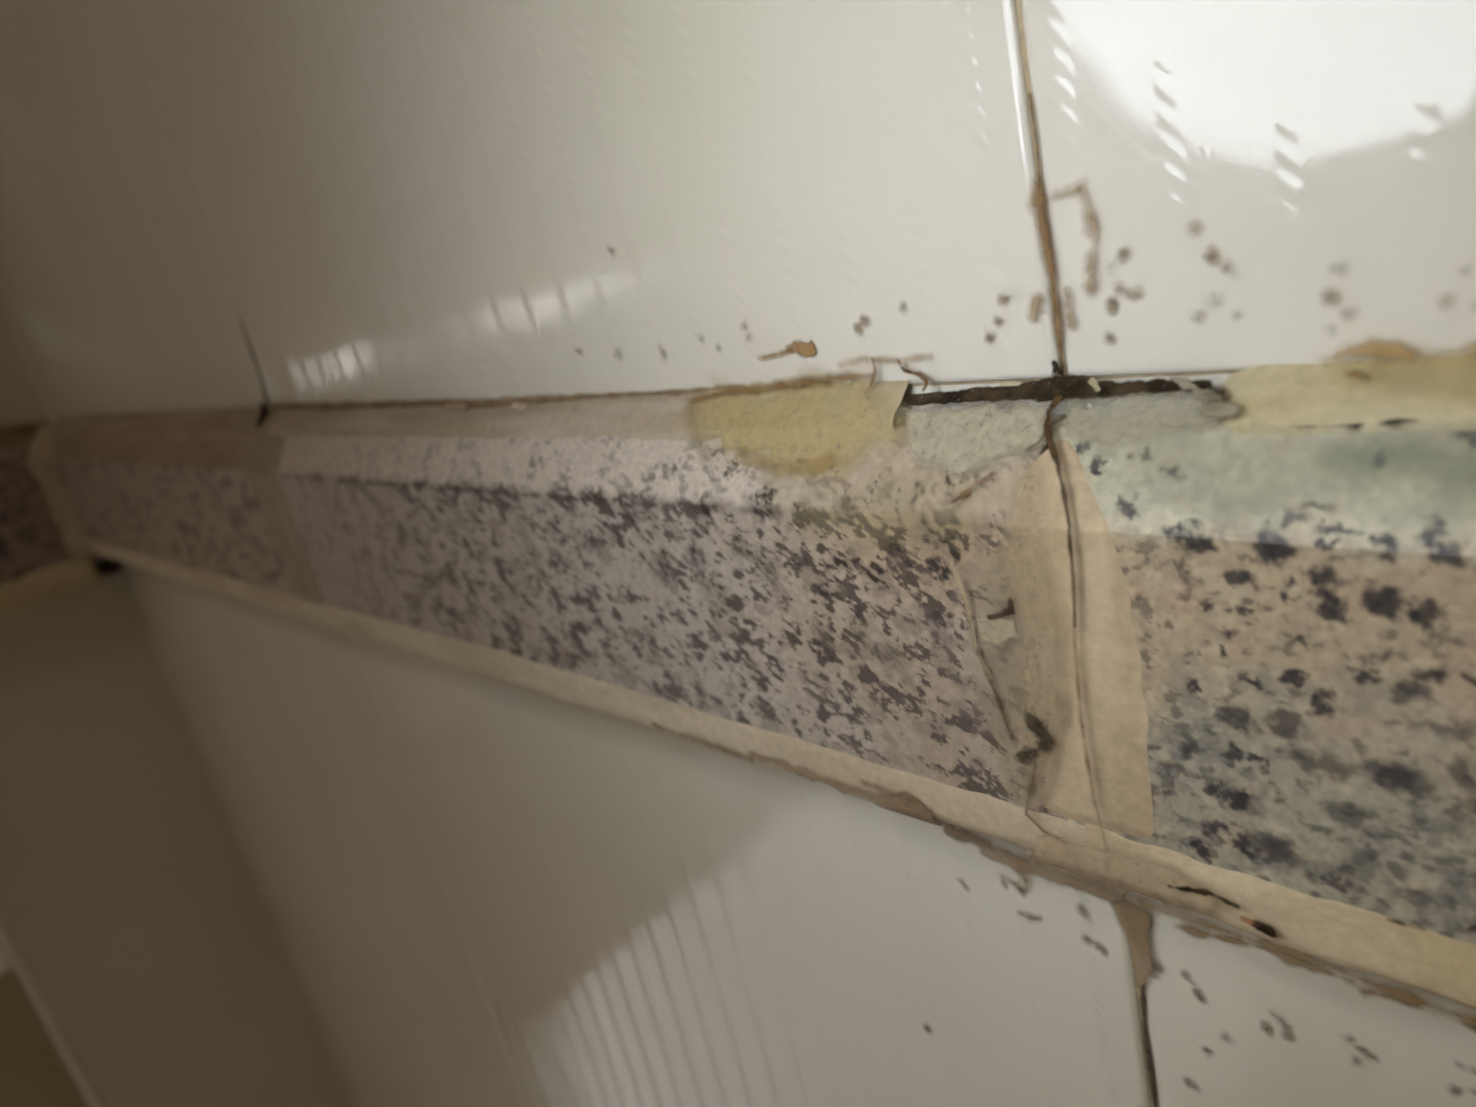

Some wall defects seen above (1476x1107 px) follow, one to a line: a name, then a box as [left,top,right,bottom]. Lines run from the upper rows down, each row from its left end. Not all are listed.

water stain [1333,339,1415,379]
water stain [691,373,892,472]
spalling [906,404,1047,501]
crack [863,94,1229,846]
spalling [1066,377,1238,444]
peeling [955,479,1060,839]
water stain [681,734,1476,1031]